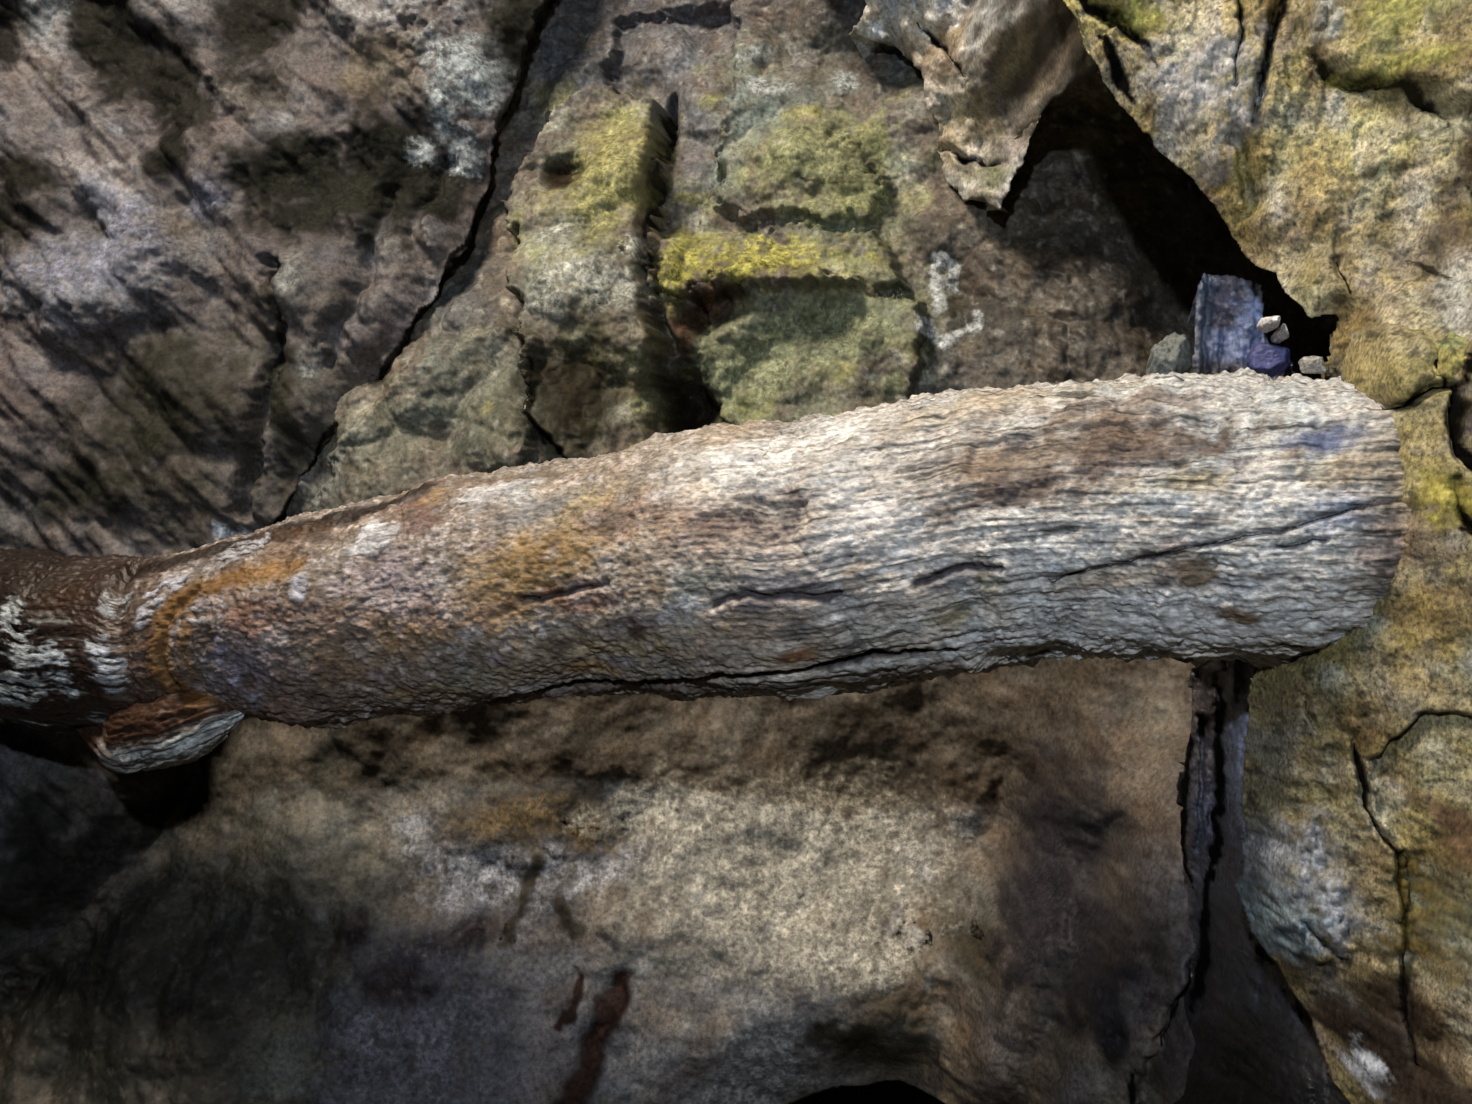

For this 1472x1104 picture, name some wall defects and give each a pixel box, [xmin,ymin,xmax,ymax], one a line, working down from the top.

crack [267,262,286,388]
crack [307,421,339,471]
crack [377,132,498,380]
crack [1352,739,1413,1030]